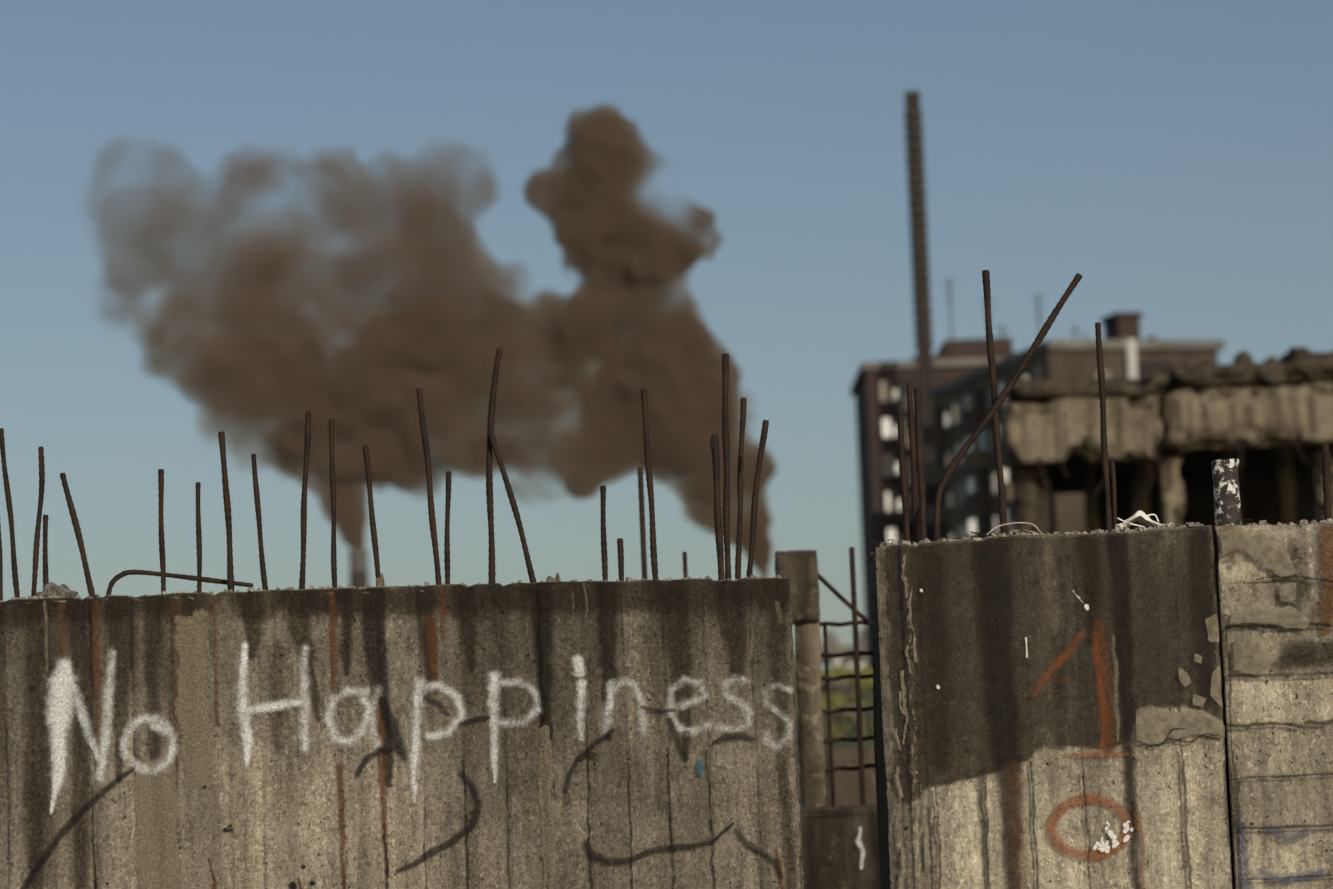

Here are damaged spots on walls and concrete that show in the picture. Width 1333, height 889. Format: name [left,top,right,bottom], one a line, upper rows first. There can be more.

corrosion [374,693,388,872]
water stain [0,578,790,889]
water stain [886,526,1223,889]
spalling [1136,529,1310,744]